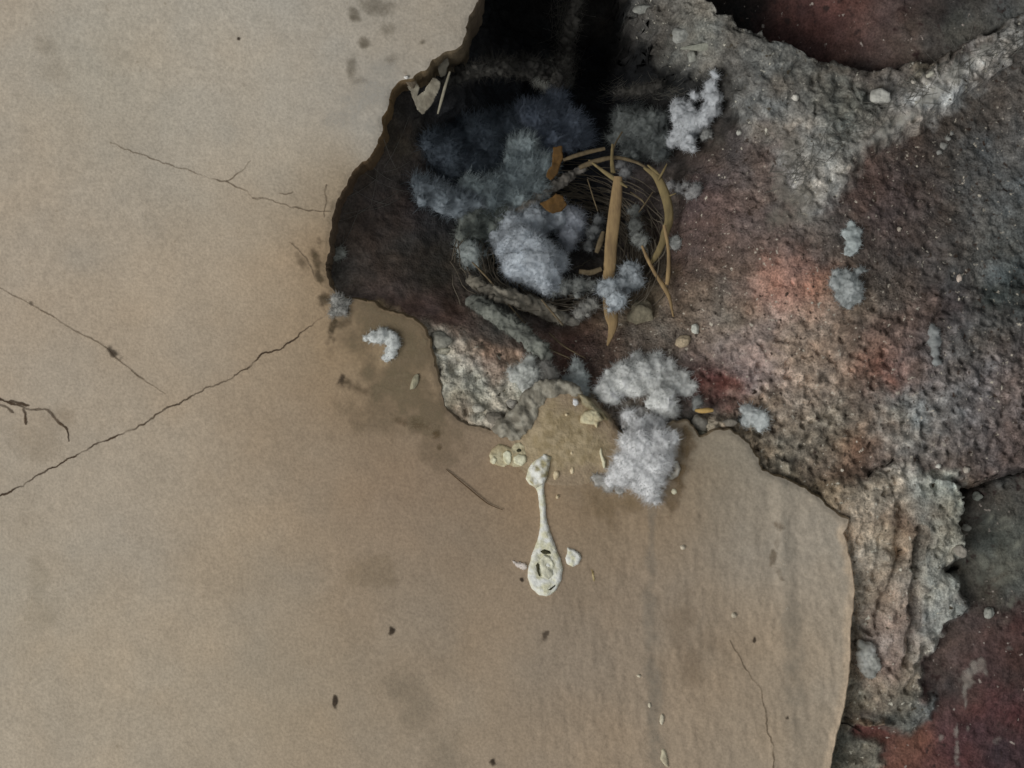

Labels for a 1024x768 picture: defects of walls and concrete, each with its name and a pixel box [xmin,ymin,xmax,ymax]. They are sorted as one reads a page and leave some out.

crack [75,331,153,386]
crack [234,326,311,376]
damp [329,304,442,449]
spalling [325,0,1024,768]
crack [0,387,207,496]